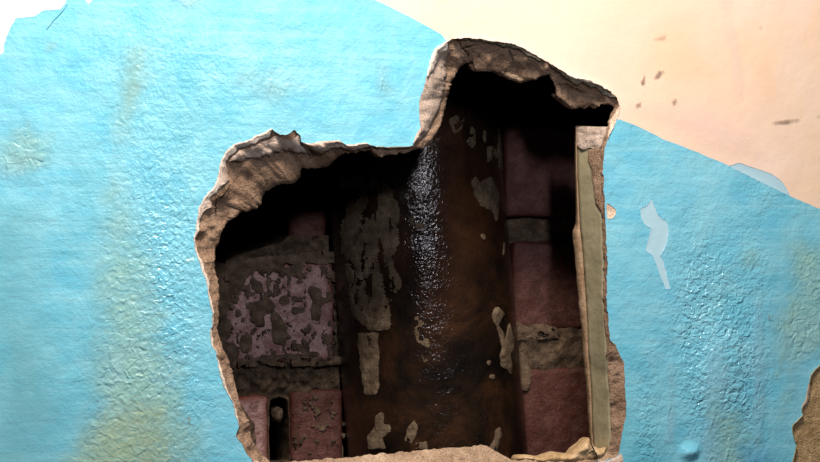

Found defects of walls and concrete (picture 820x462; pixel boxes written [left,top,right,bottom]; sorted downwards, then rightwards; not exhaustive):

flaking render [193,37,626,462]
peeling [640,199,670,289]
flaking render [792,366,820,462]